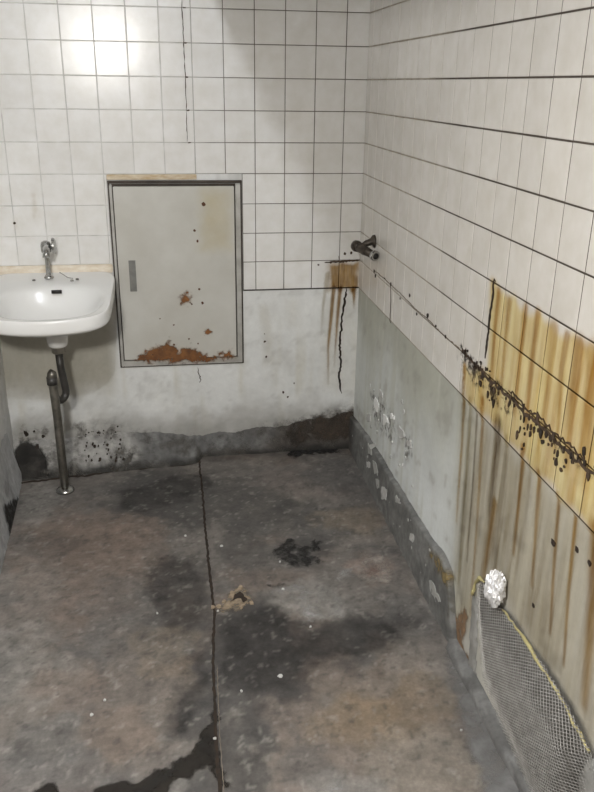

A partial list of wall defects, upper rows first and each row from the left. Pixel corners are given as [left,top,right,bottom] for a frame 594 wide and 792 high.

rust [317,251,360,320]
rust [135,338,233,364]
crack [338,288,347,393]
crack [373,270,594,481]
leakage [15,429,58,479]
leakage [272,411,354,457]
peeling [362,384,412,504]
peeling [429,580,441,602]
crack [21,460,224,792]
rust [456,608,469,659]
leakage [93,711,229,792]
leakage [34,783,59,792]